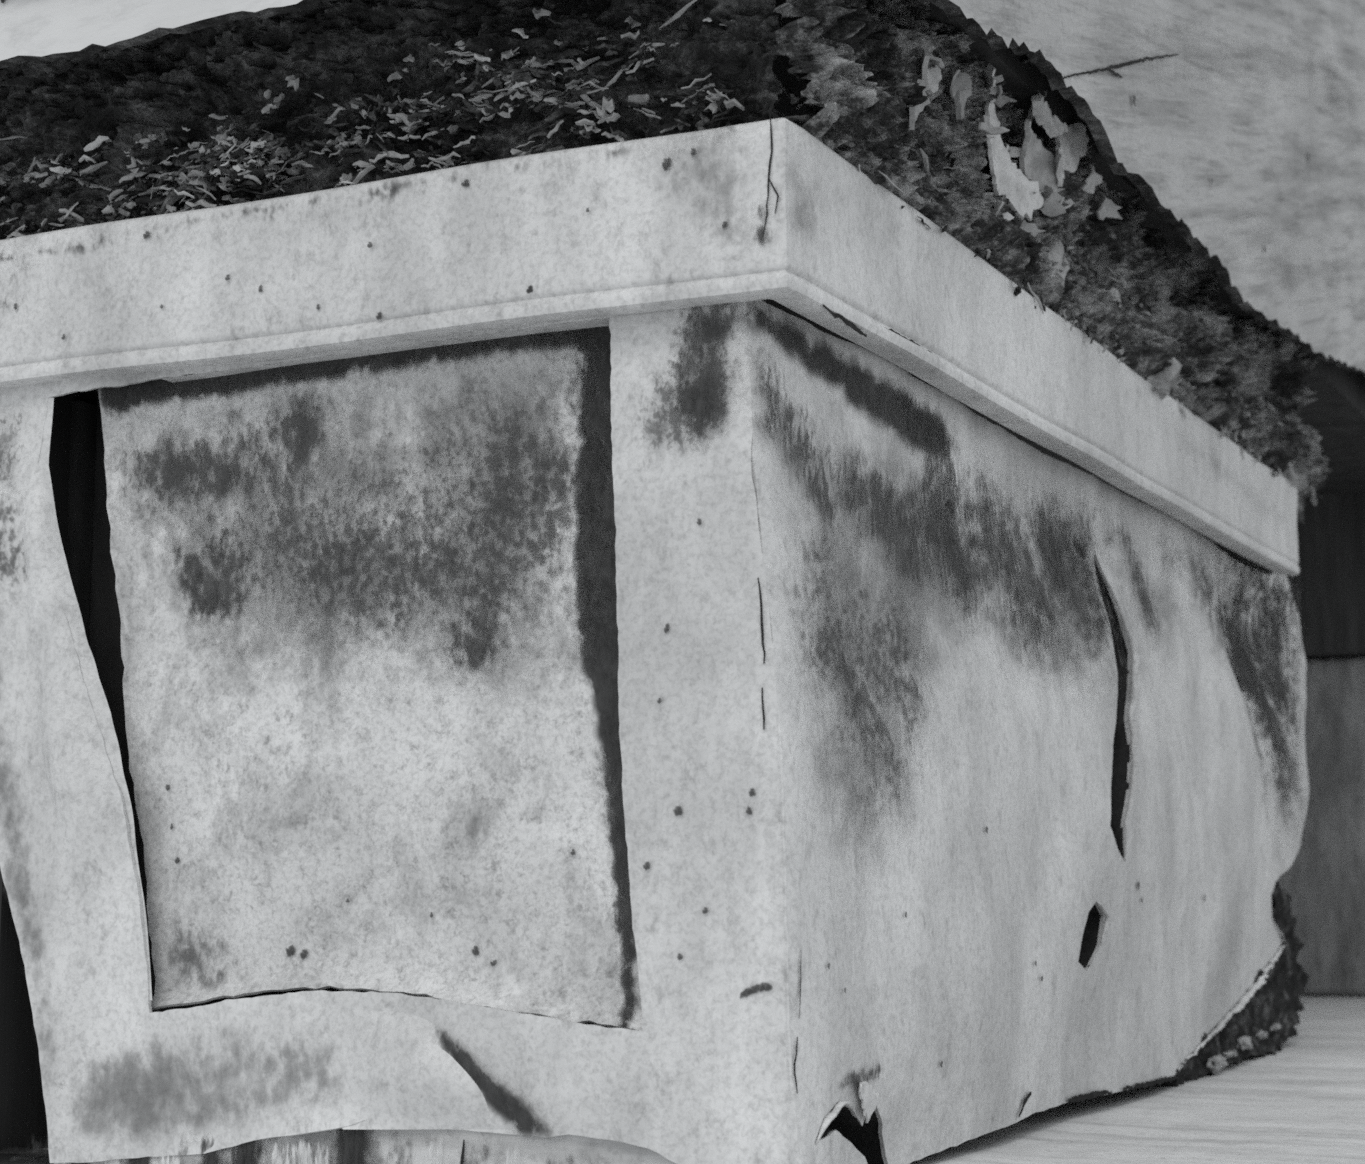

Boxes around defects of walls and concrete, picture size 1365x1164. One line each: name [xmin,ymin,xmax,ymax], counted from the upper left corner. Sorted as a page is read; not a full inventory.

crack [763,114,779,235]
peeling [907,49,1122,237]
damp [643,303,1158,660]
damp [99,326,637,1029]
damp [800,548,923,798]
damp [1191,550,1303,821]
damp [0,1144,50,1164]
damp [105,1156,180,1164]
damp [201,1129,367,1164]